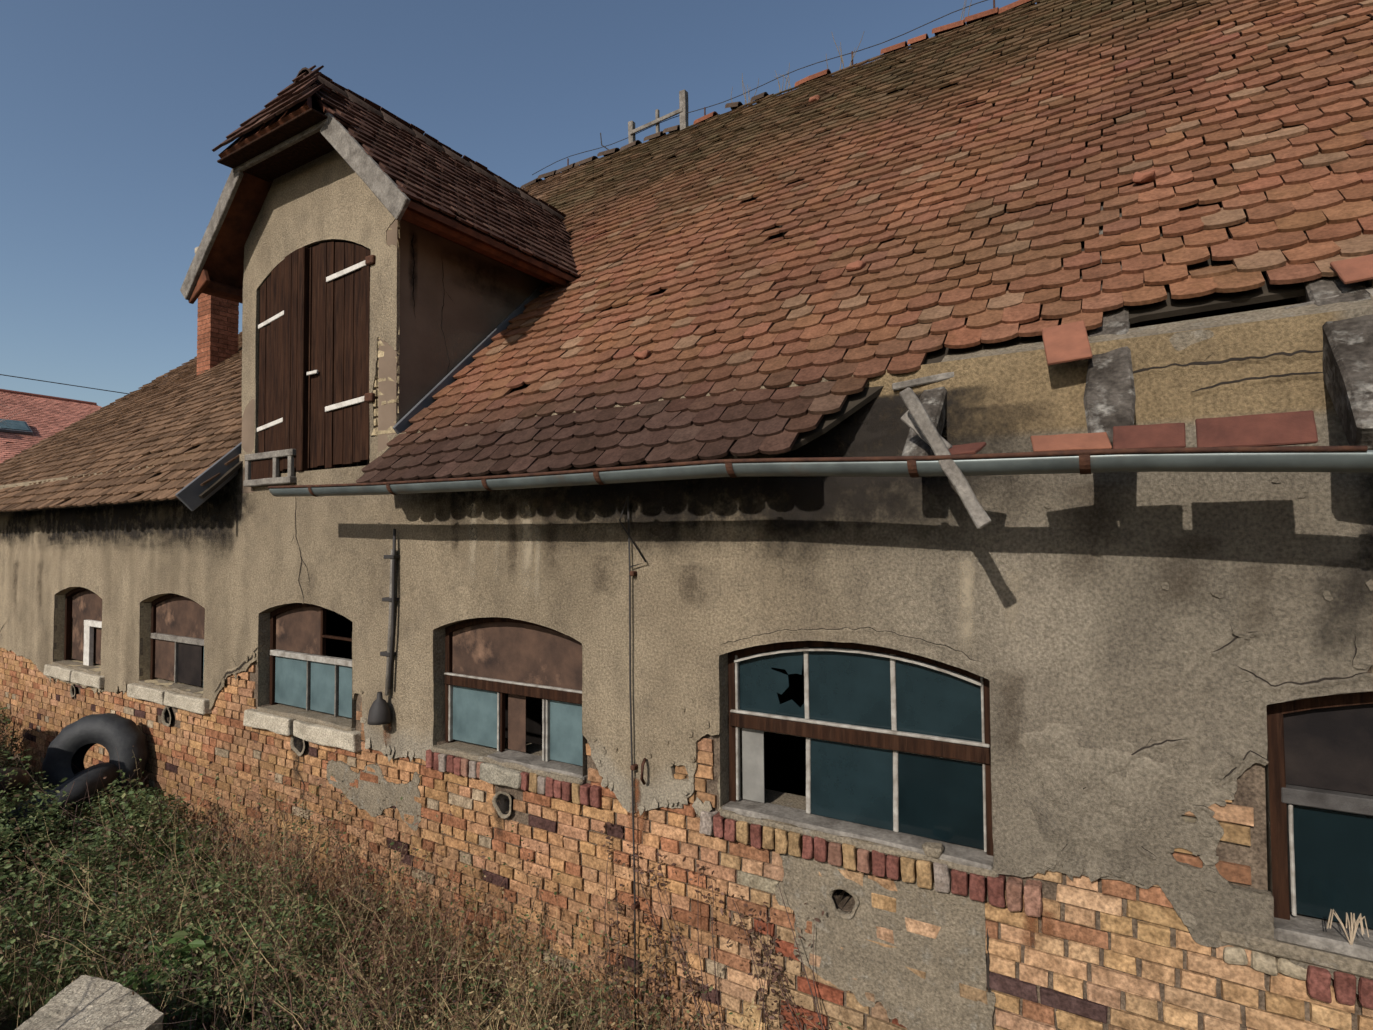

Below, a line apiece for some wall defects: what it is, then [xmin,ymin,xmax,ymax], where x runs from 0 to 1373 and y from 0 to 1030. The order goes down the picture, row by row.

crack [1133,350,1323,398]
leakage [772,392,923,458]
leakage [941,388,1006,445]
leakage [431,476,953,592]
leakage [960,559,974,637]
flaking render [356,689,415,762]
flaking render [586,736,618,791]
flaking render [638,722,717,816]
flaking render [1166,754,1254,893]